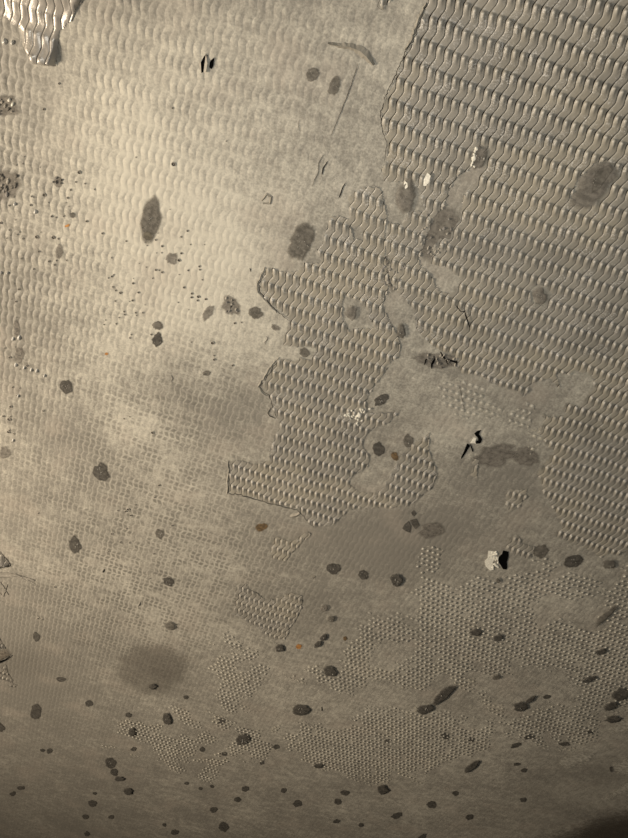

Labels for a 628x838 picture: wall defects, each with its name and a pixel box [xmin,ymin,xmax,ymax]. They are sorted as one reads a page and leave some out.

spalling [0,96,18,115]
peeling [380,3,427,161]
spalling [0,172,20,199]
spalling [416,210,459,258]
spalling [222,296,239,314]
peeling [256,267,288,320]
spalling [414,353,458,369]
flaking render [411,546,628,752]
flaking render [117,705,272,784]